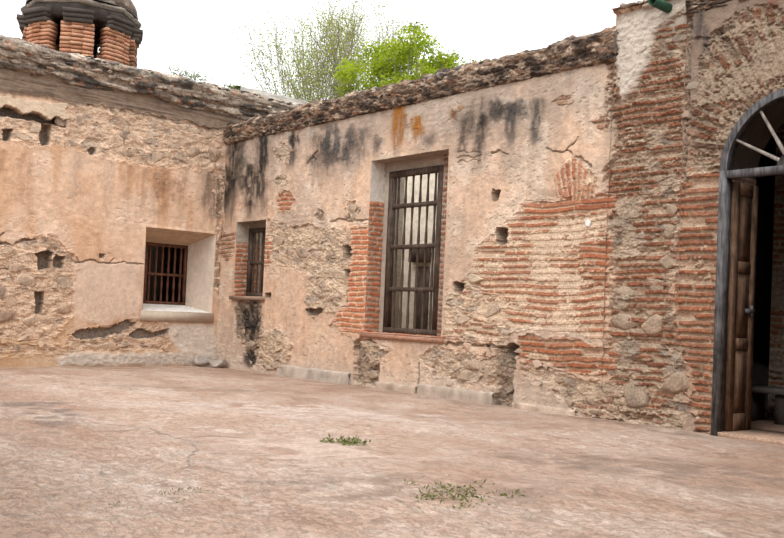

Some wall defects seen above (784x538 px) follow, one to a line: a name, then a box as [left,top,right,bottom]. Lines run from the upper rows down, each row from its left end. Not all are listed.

crack [0,231,37,247]
spalling [0,232,178,358]
crack [74,256,144,265]
spalling [0,103,236,293]
leakage [204,136,268,212]
spalling [233,292,271,369]
spalling [264,142,392,388]
leakage [315,126,366,163]
leakage [460,100,543,154]
crack [545,136,593,170]
spalling [418,0,784,433]